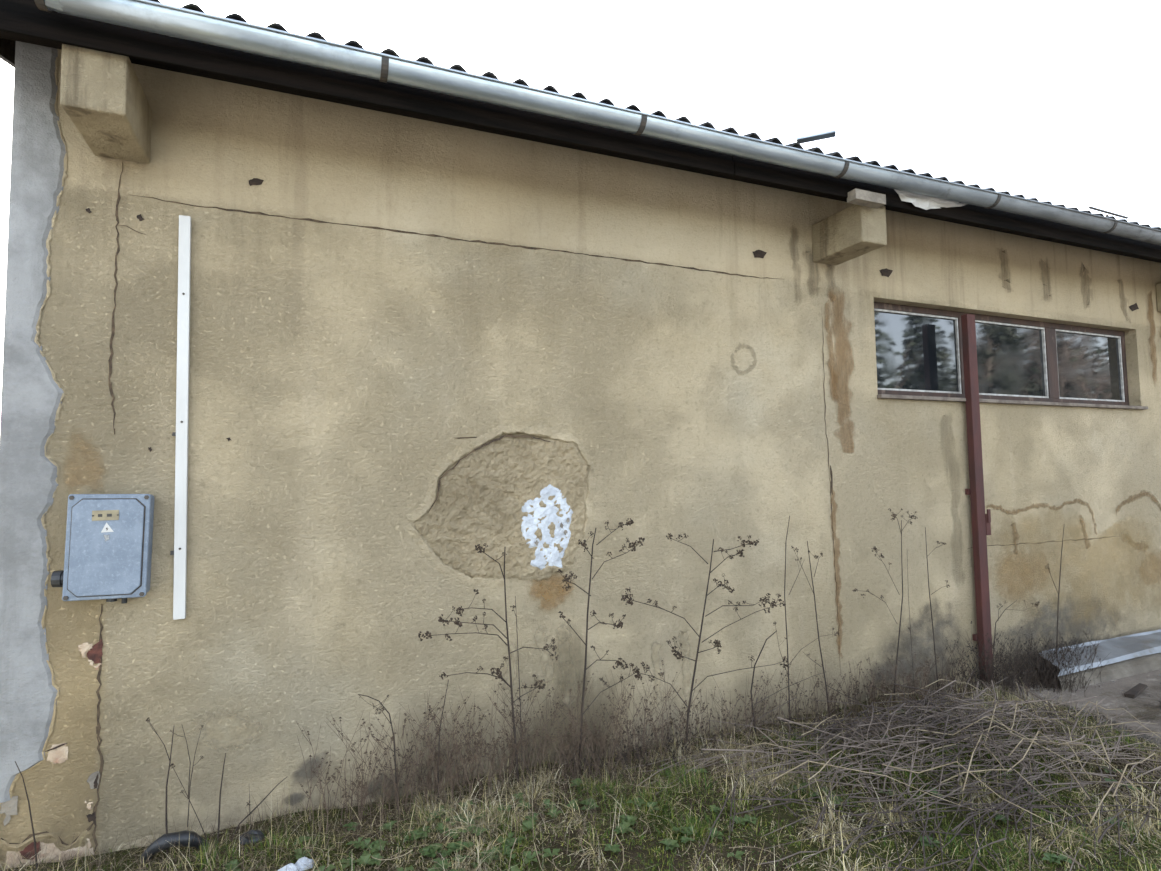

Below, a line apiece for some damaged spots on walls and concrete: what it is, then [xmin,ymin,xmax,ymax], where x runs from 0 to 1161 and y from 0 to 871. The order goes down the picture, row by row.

crack [108,162,776,434]
corrosion [825,294,853,453]
crack [968,536,1119,549]
flaking render [78,639,103,670]
crack [1,605,104,852]
flaking render [45,743,68,764]
flaking render [0,771,100,869]